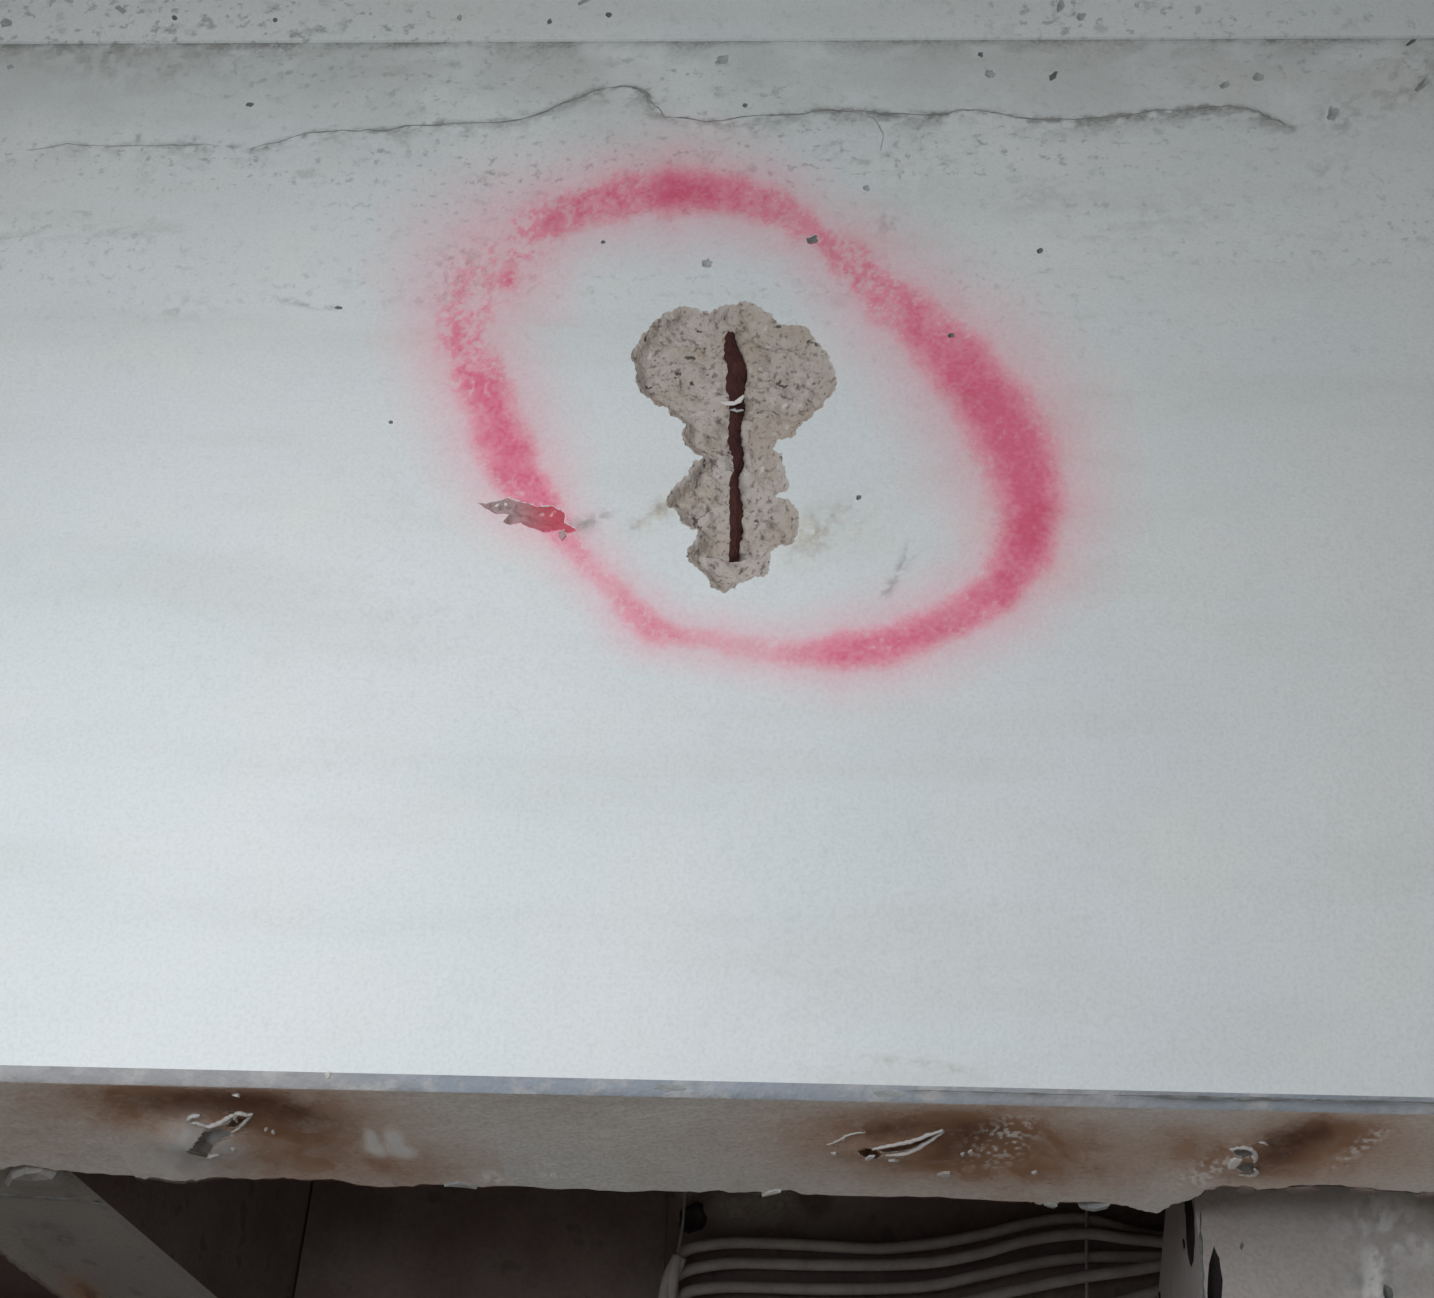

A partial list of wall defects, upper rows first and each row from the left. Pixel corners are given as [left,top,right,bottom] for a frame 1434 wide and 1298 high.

crack [29,85,1295,154]
spalling [631,301,837,593]
corrosion [53,1084,461,1186]
corrosion [788,1104,1115,1190]
corrosion [1148,1113,1403,1182]